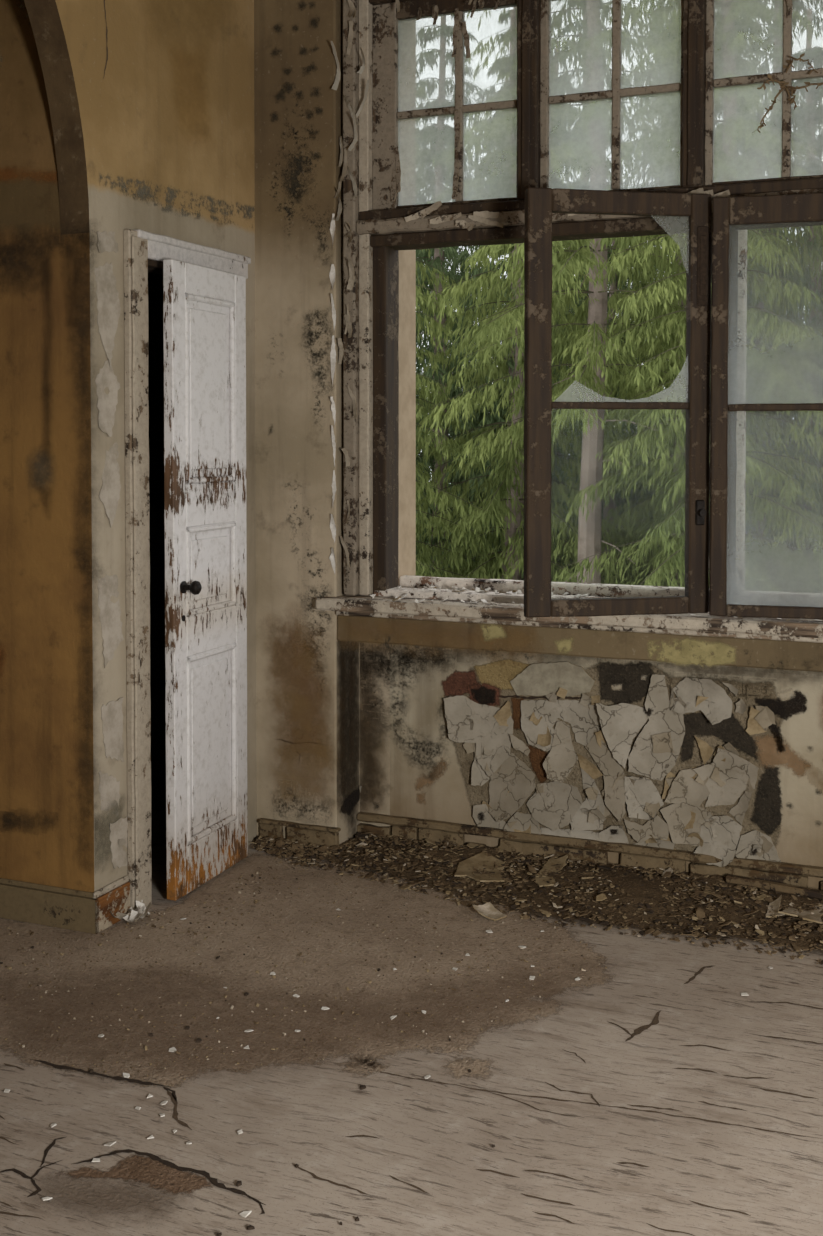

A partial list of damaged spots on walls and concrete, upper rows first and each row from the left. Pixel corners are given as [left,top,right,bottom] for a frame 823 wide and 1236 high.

peeling [452,0,499,59]
water stain [271,48,322,225]
peeling [404,109,504,231]
peeling [329,0,370,573]
water stain [305,312,330,417]
water stain [302,554,330,694]
water stain [638,660,823,677]
water stain [337,639,496,834]
peeling [441,638,811,867]
crack [0,1115,65,1219]
spalling [45,1149,266,1214]
crack [163,1087,192,1130]